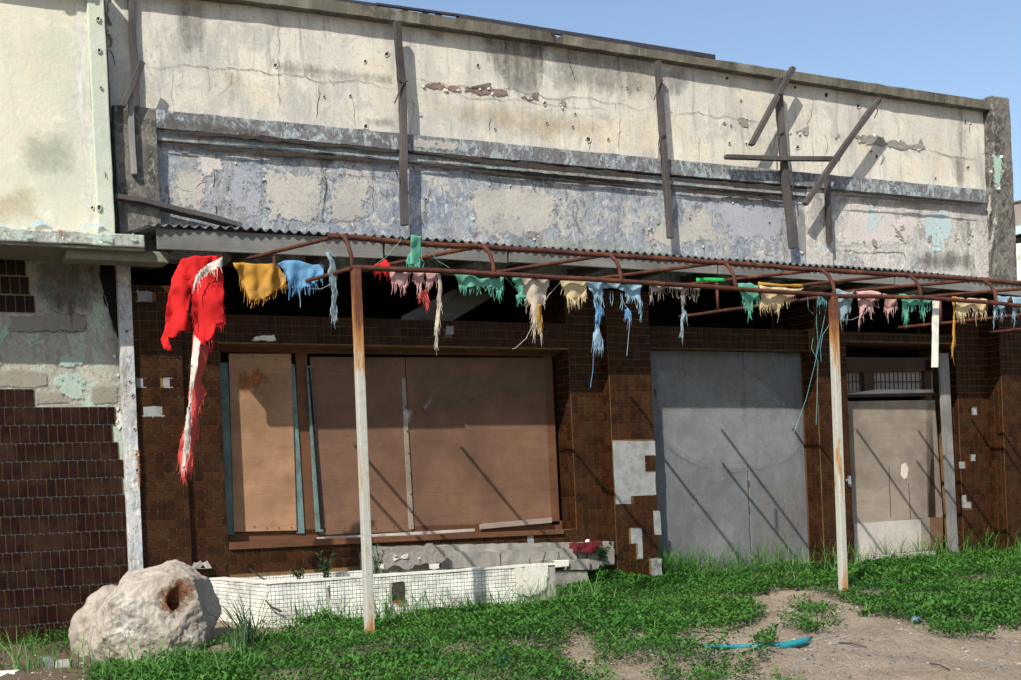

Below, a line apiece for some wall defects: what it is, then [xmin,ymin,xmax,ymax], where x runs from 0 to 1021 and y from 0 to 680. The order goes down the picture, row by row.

crack [145,28,644,148]
spalling [422,82,508,97]
spalling [855,134,926,159]
peeling [174,155,373,224]
peeling [472,183,563,240]
peeling [643,196,784,256]
peeling [985,155,1004,253]
spalling [100,265,129,338]
peeling [0,325,146,431]
peeling [613,441,656,504]
peeling [631,528,662,576]
peeling [653,511,661,535]